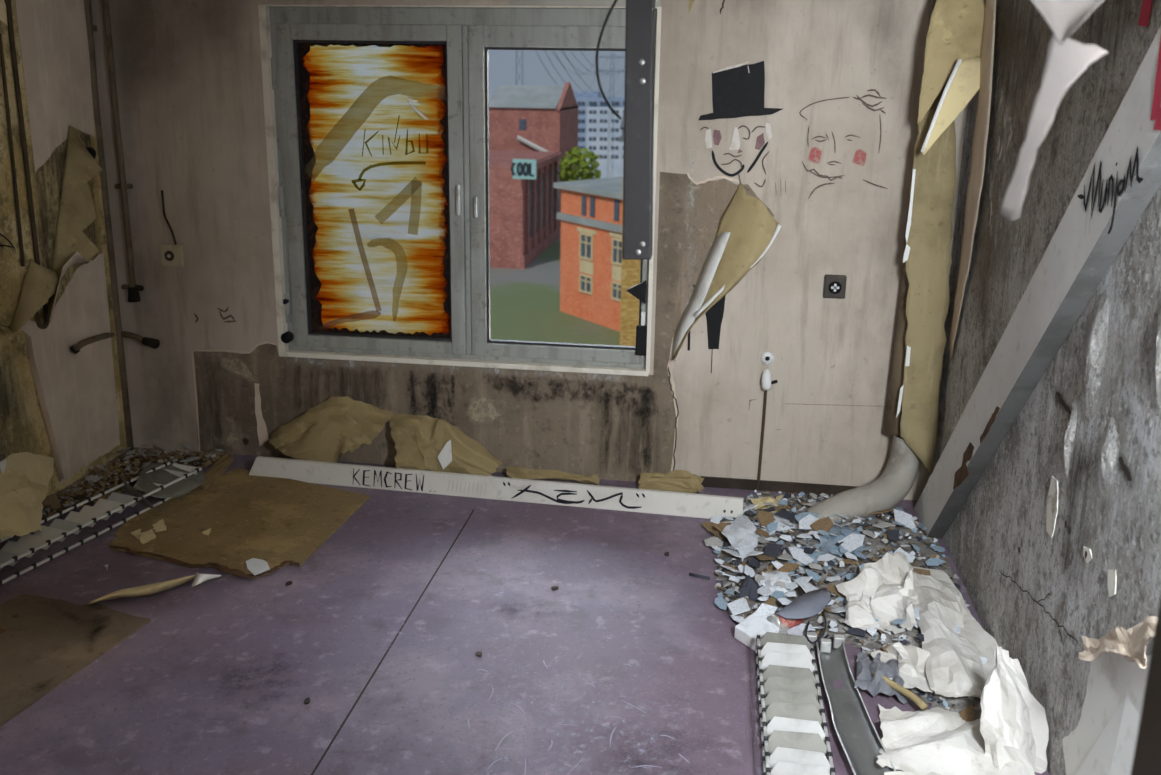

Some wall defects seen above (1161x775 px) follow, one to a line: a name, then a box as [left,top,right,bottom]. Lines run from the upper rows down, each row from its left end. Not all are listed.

water stain [408,368,454,425]
water stain [489,368,655,474]